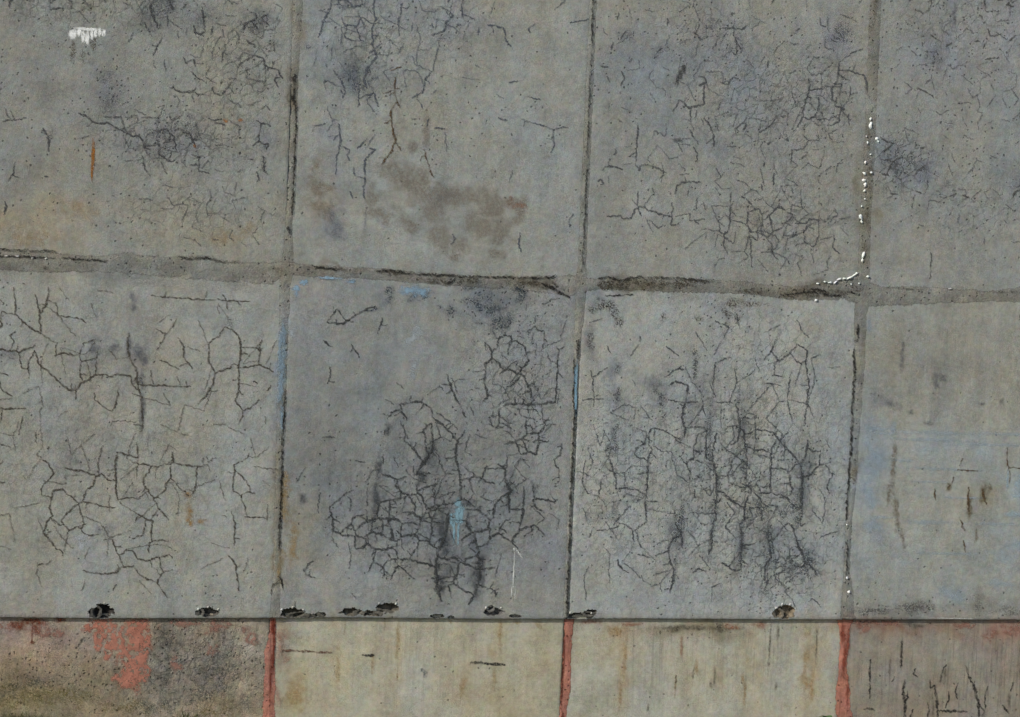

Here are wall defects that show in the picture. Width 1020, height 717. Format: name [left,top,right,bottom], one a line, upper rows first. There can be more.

crack [79,0,534,262]
crack [881,0,1020,243]
crack [0,248,106,262]
crack [317,0,868,619]
crack [0,287,302,596]
spalling [483,605,521,618]
spalling [567,609,598,619]
spalling [772,603,796,620]